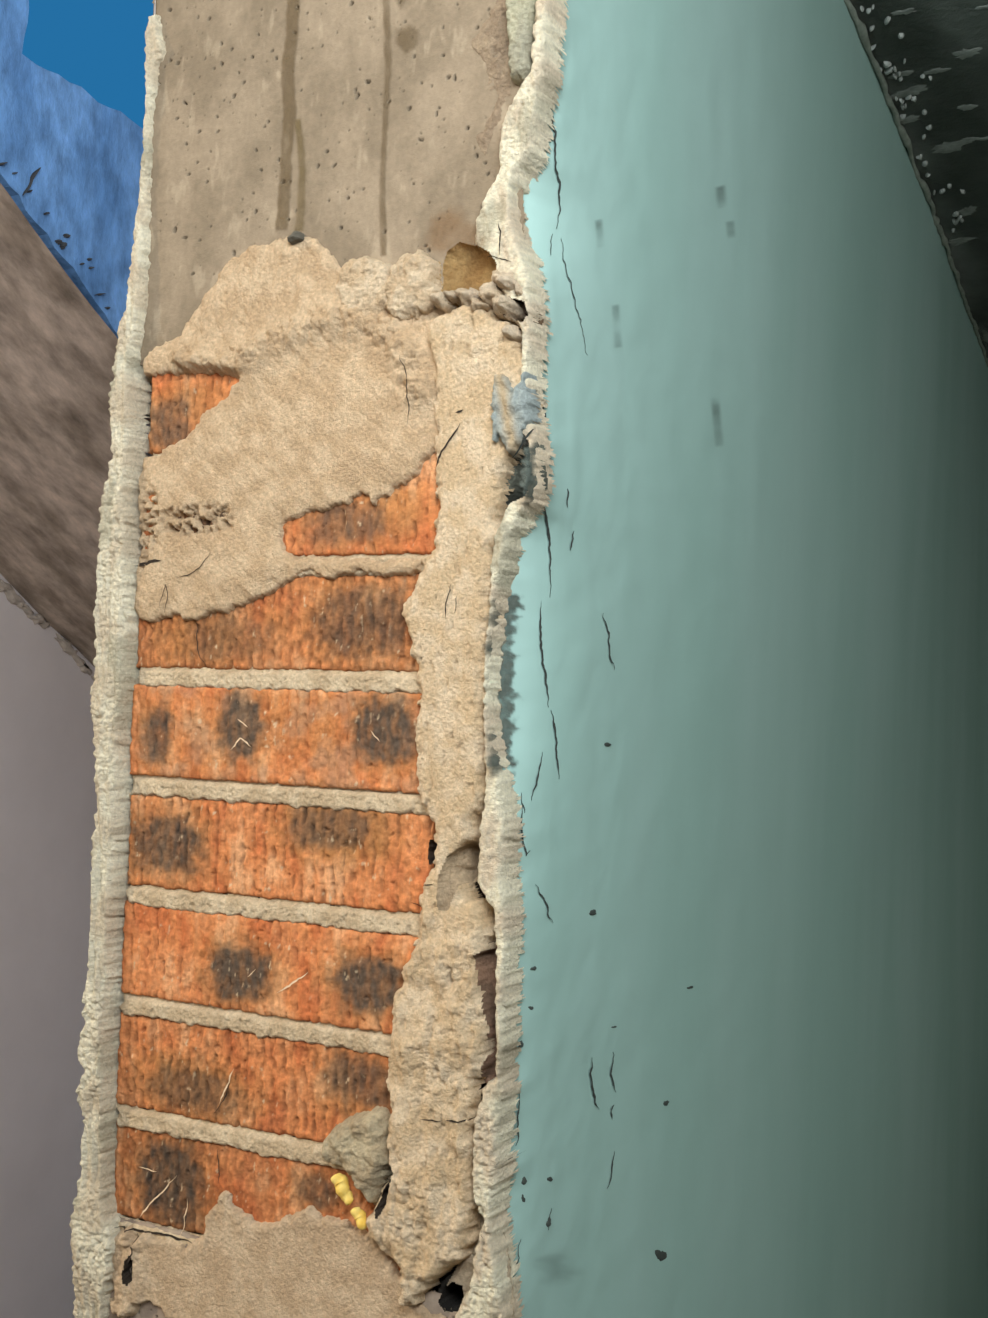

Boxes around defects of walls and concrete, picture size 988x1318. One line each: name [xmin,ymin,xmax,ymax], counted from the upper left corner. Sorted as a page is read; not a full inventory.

damp [276,0,305,229]
damp [382,17,409,153]
damp [934,84,984,150]
flaking render [0,0,569,1318]